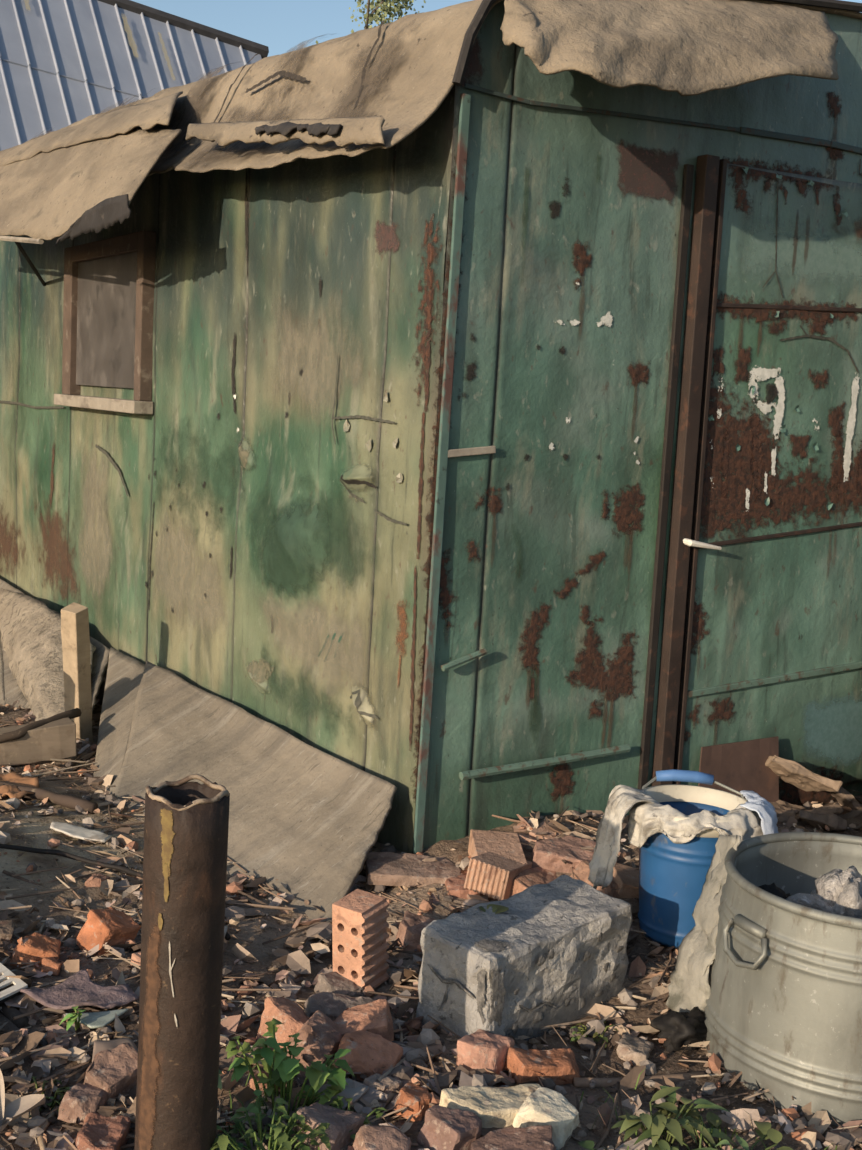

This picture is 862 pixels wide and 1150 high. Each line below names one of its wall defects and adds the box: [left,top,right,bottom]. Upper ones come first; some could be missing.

corrosion [617,140,679,204]
corrosion [723,147,844,226]
corrosion [628,363,649,386]
corrosion [699,292,862,542]
corrosion [0,515,26,574]
corrosion [39,444,80,599]
corrosion [396,213,463,799]
corrosion [601,483,645,567]
corrosion [518,551,606,703]
corrosion [564,605,639,743]
corrosion [684,697,735,742]
corrosion [547,763,576,801]